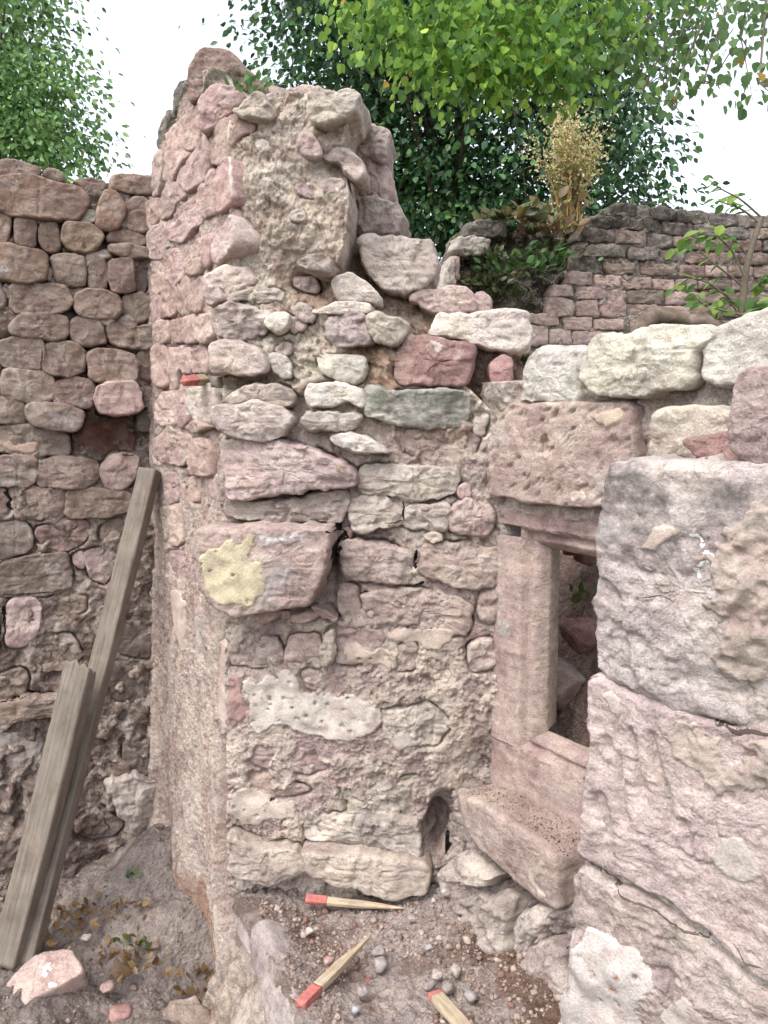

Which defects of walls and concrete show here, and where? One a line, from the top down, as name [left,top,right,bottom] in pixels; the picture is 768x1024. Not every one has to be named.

crack [581,859,763,969]